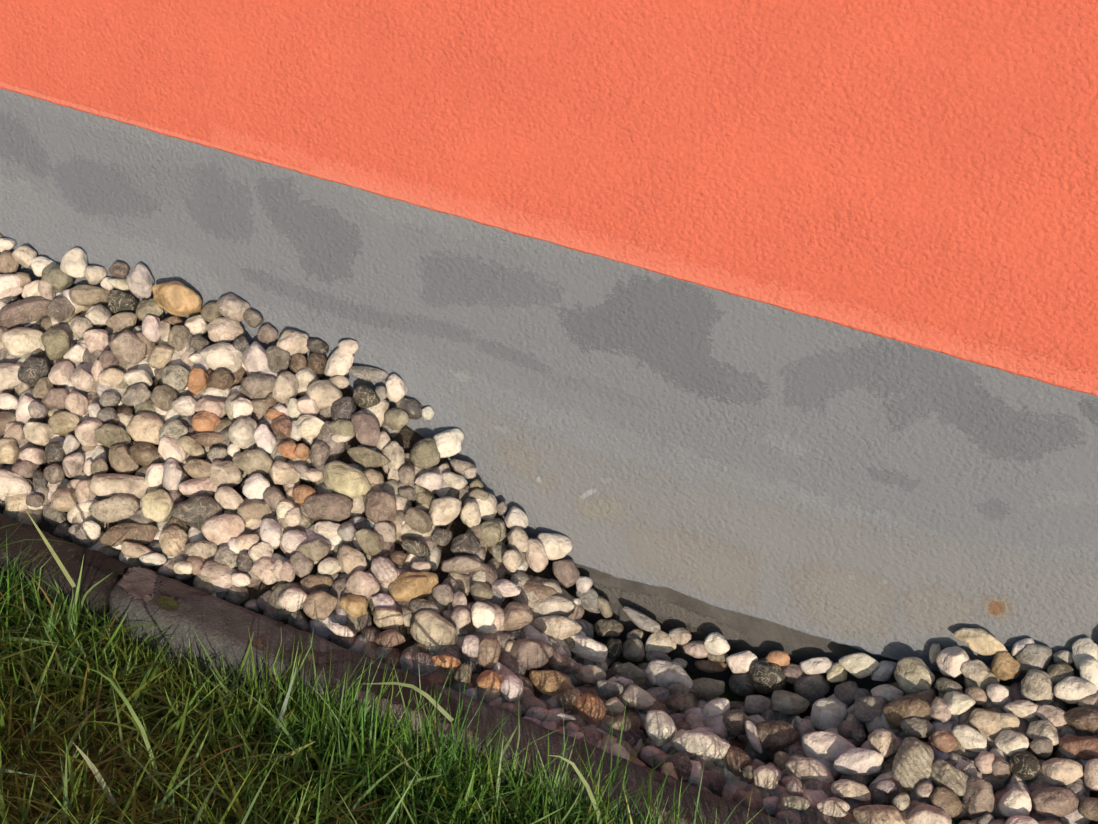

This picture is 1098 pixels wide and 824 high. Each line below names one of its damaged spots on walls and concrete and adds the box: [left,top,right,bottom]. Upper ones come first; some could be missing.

water stain [0,92,1098,552]
corrosion [988,600,1006,616]